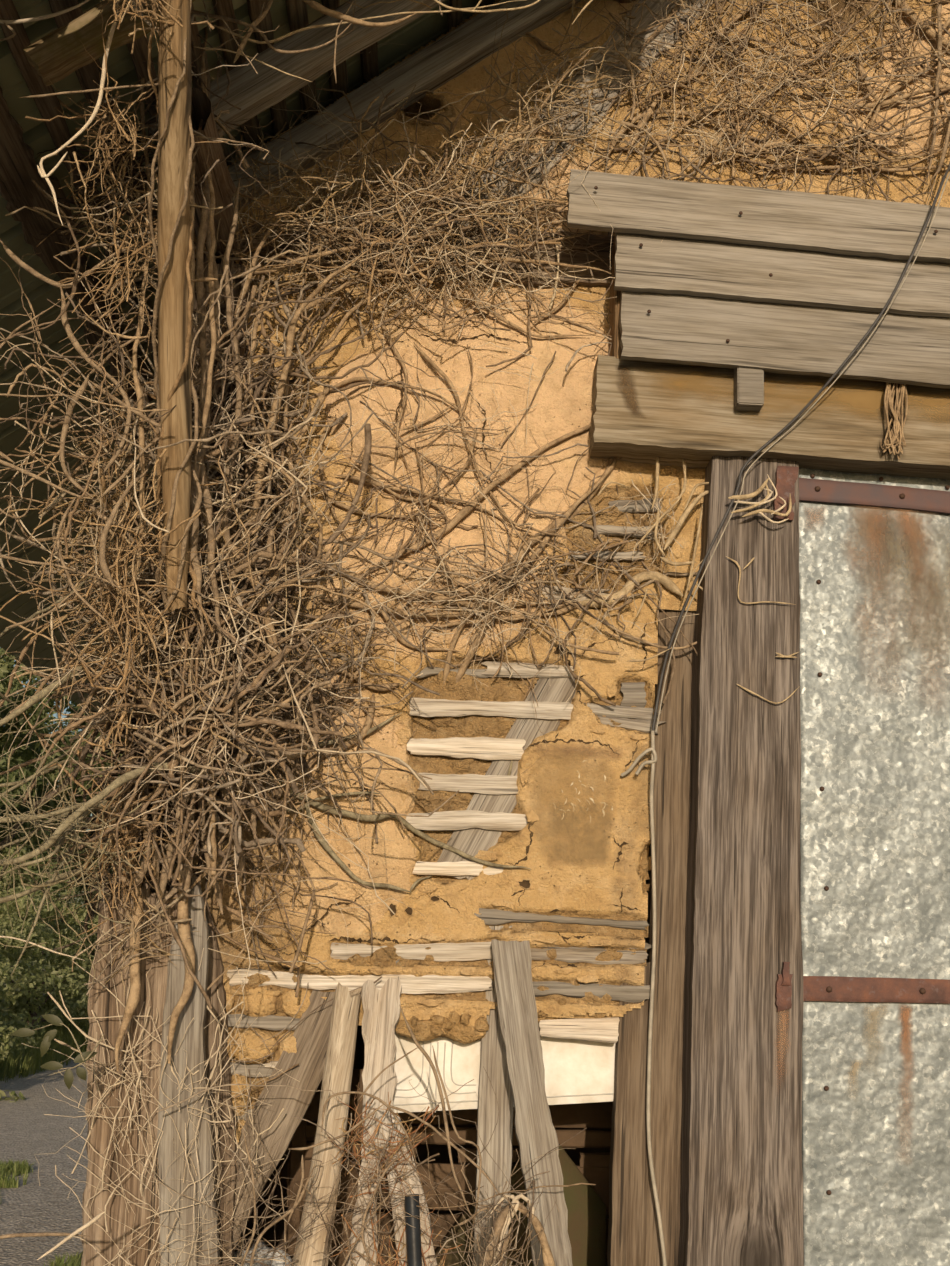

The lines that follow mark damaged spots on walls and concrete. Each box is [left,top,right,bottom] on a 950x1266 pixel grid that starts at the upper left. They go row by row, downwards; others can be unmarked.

spalling [547,484,667,602]
spalling [395,646,541,813]
crack [524,733,639,771]
spalling [571,678,654,741]
spalling [474,804,541,861]
spalling [407,830,454,902]
spalling [516,879,532,890]
spalling [638,845,652,893]
spalling [227,899,649,1109]
rust [901,1009,910,1059]